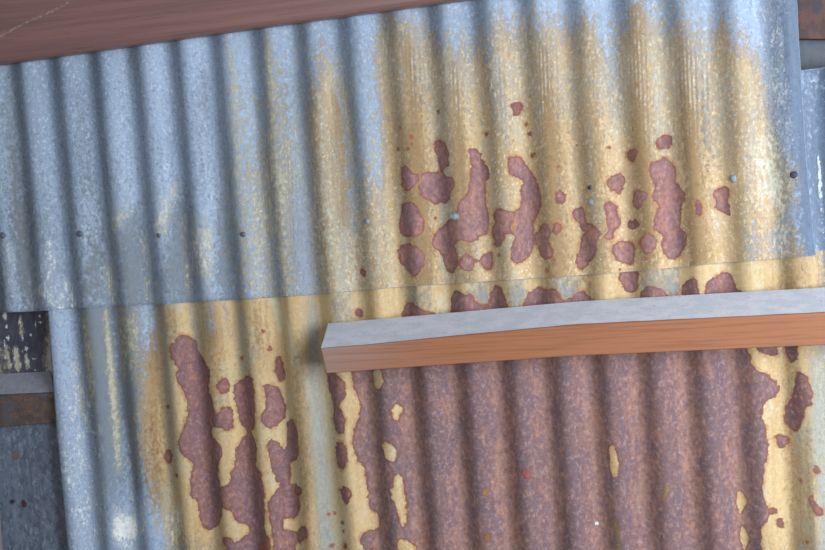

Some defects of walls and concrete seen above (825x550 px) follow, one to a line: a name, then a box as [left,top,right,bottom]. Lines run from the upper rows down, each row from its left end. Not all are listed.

rust [191,216,215,289]
rust [102,309,122,470]